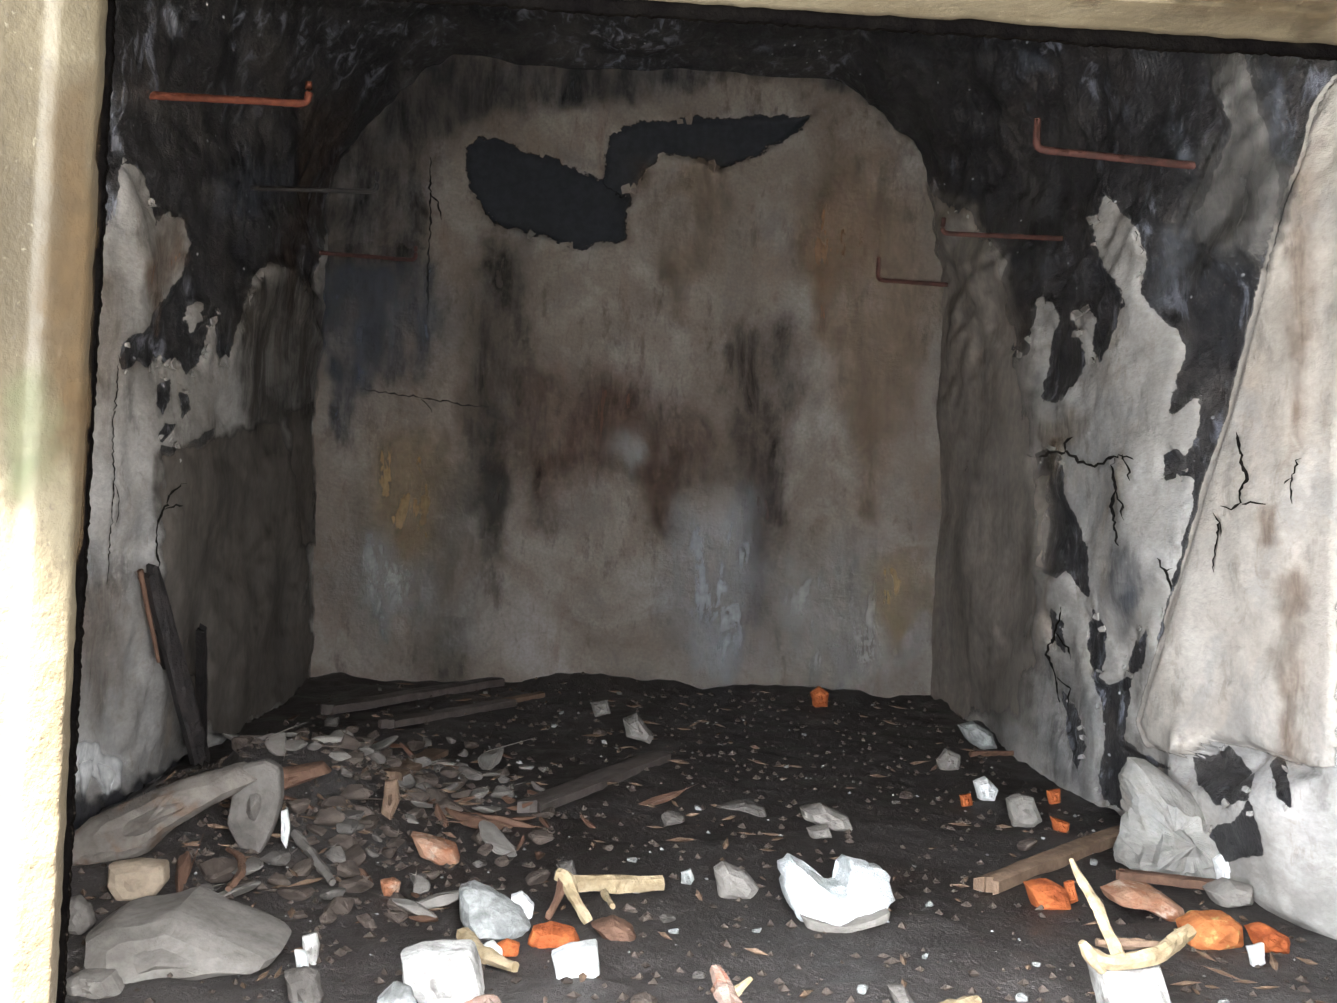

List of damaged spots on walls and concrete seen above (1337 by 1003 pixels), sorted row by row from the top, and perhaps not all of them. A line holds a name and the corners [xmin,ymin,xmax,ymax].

spalling [105,0,458,463]
spalling [465,109,819,253]
leakage [465,238,529,541]
leakage [689,329,786,685]
crack [1027,437,1133,546]
crack [1157,558,1173,591]
crack [1212,432,1301,572]
spalling [1193,744,1263,862]
spalling [1269,754,1291,812]